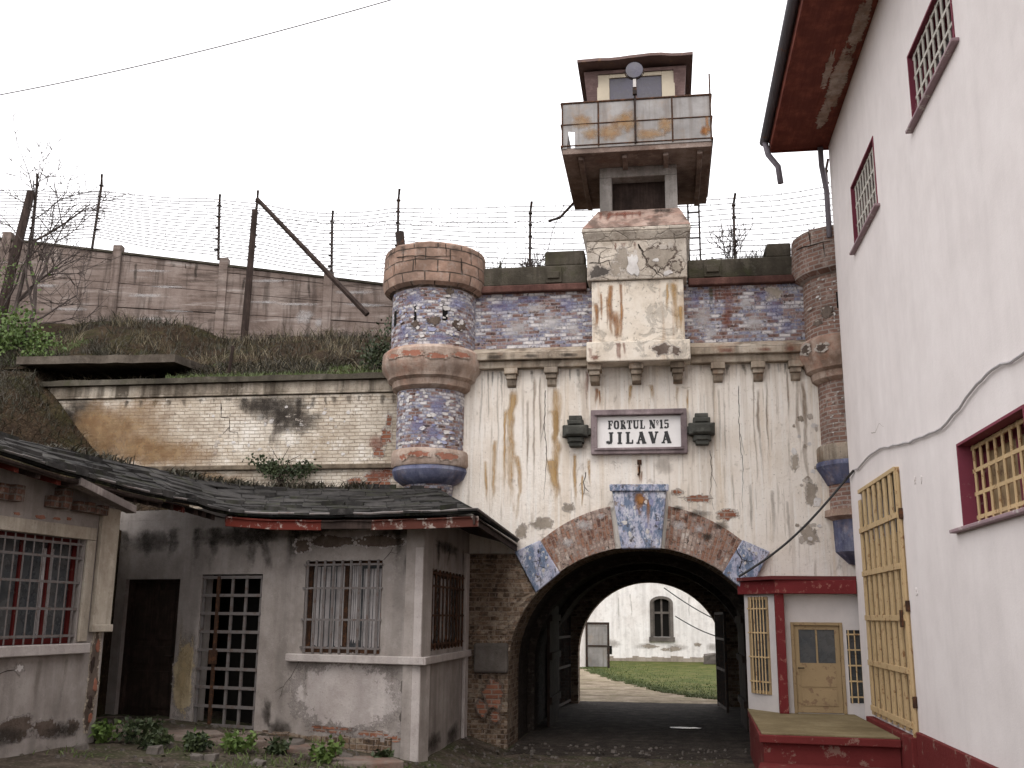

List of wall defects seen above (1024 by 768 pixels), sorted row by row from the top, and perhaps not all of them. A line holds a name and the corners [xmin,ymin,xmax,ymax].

peeling [815,0,872,129]
rust [576,113,671,138]
flaking render [588,241,683,280]
flaking render [387,287,473,360]
flaking render [649,342,683,357]
damp [66,401,208,463]
damp [229,398,314,431]
rust [548,391,560,490]
damp [123,532,176,550]
damp [210,529,276,561]
damp [290,529,344,550]
flaking render [0,632,102,745]